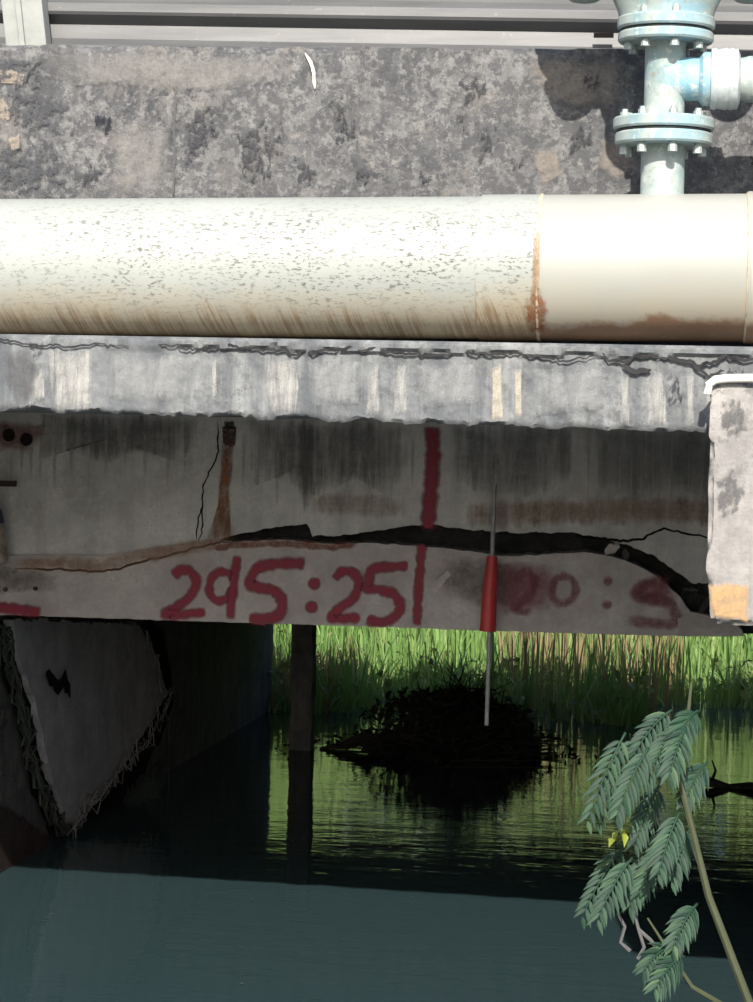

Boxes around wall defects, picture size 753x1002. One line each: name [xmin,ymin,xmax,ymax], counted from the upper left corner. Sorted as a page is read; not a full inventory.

corrosion [527,248,547,332]
leakage [115,357,191,396]
leakage [492,368,503,418]
leakage [539,370,600,412]
leakage [722,399,747,435]
crack [15,421,243,573]
corrosion [141,445,354,560]
leakage [268,424,391,495]
leakage [603,434,745,516]
spalling [604,542,629,561]
crack [575,527,708,543]
spalling [677,575,710,614]